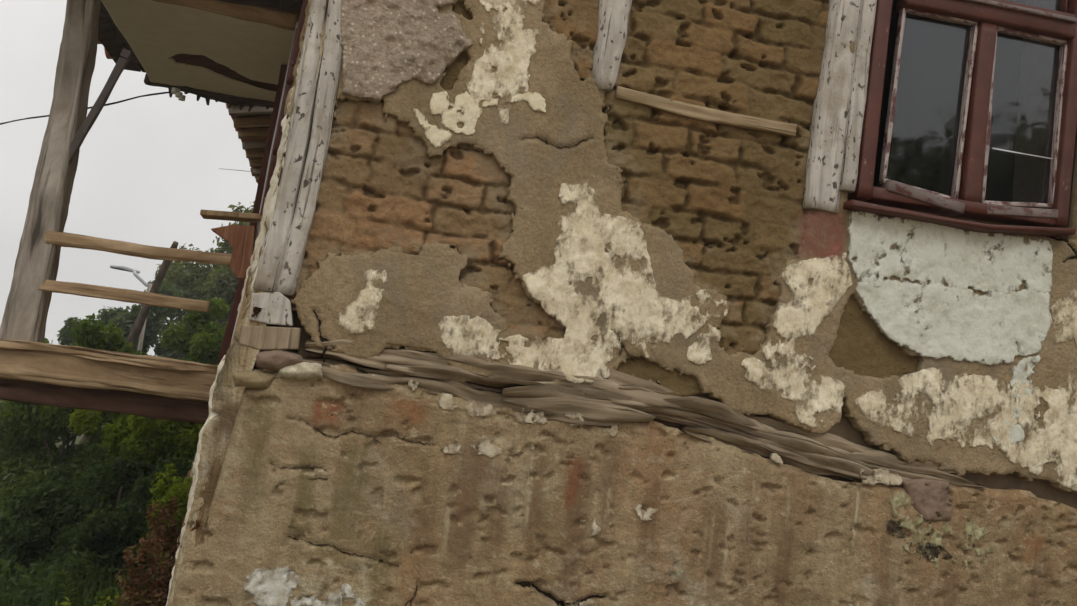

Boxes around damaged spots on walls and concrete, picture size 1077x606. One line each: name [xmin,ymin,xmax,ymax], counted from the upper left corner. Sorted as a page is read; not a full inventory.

crack [521,137,587,149]
peeling [236,10,310,321]
spalling [283,0,1077,491]
peeling [166,355,226,606]
crack [288,536,399,567]
peeling [244,567,366,606]
crack [516,581,606,606]